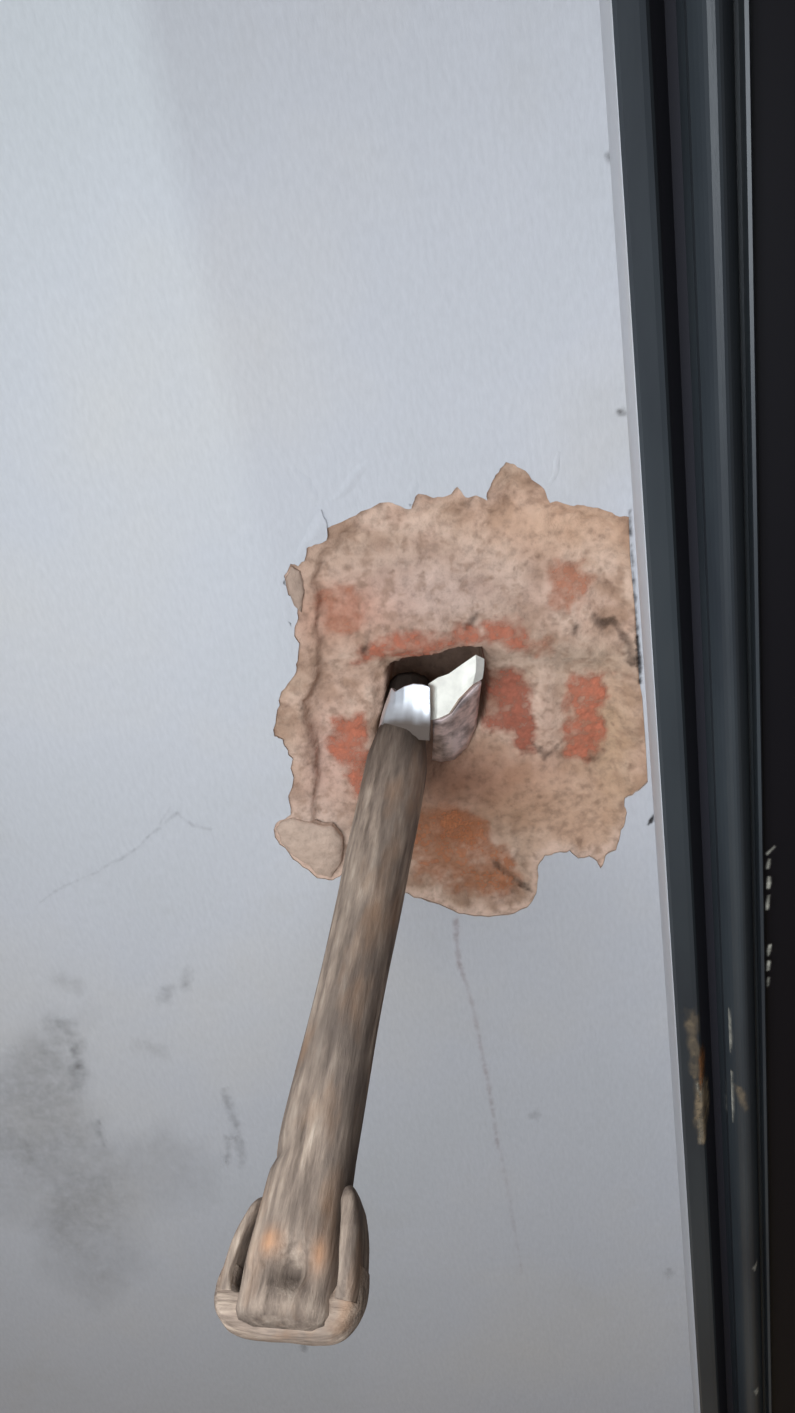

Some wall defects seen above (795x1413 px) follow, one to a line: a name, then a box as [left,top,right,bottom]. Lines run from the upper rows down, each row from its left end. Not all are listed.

spalling [273,462,648,917]